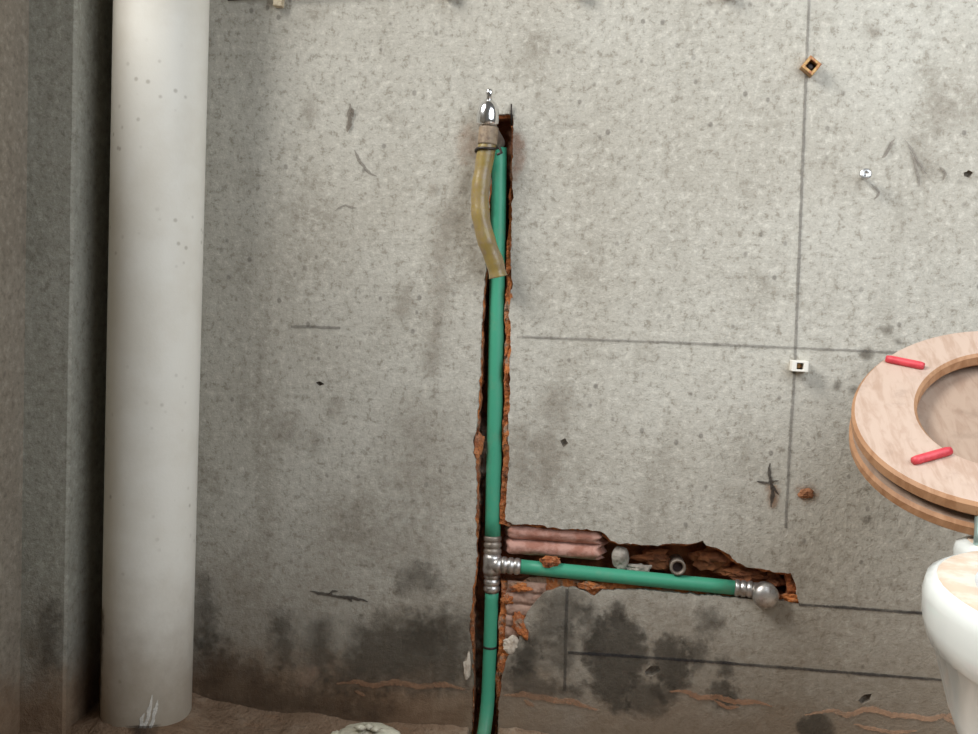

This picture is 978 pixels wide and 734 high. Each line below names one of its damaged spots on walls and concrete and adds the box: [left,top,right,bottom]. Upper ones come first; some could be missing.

spalling [473,272,487,543]
spalling [499,115,799,603]
spalling [470,557,478,734]
spalling [495,556,747,734]
damp [586,612,688,711]
crack [670,690,772,709]
damp [797,714,831,734]
crack [805,706,954,734]